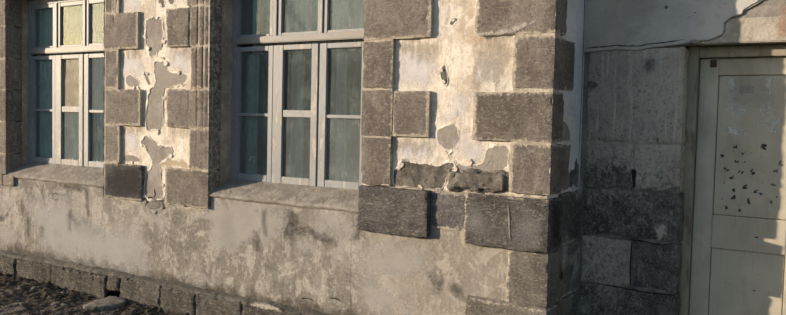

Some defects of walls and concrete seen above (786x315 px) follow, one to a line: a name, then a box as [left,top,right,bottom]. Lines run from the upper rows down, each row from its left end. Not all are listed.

flaking render [731,0,786,19]
peeling [123,0,189,215]
leakage [106,168,138,196]
peeling [391,121,511,193]
leakage [35,185,143,271]
leakage [209,202,358,254]